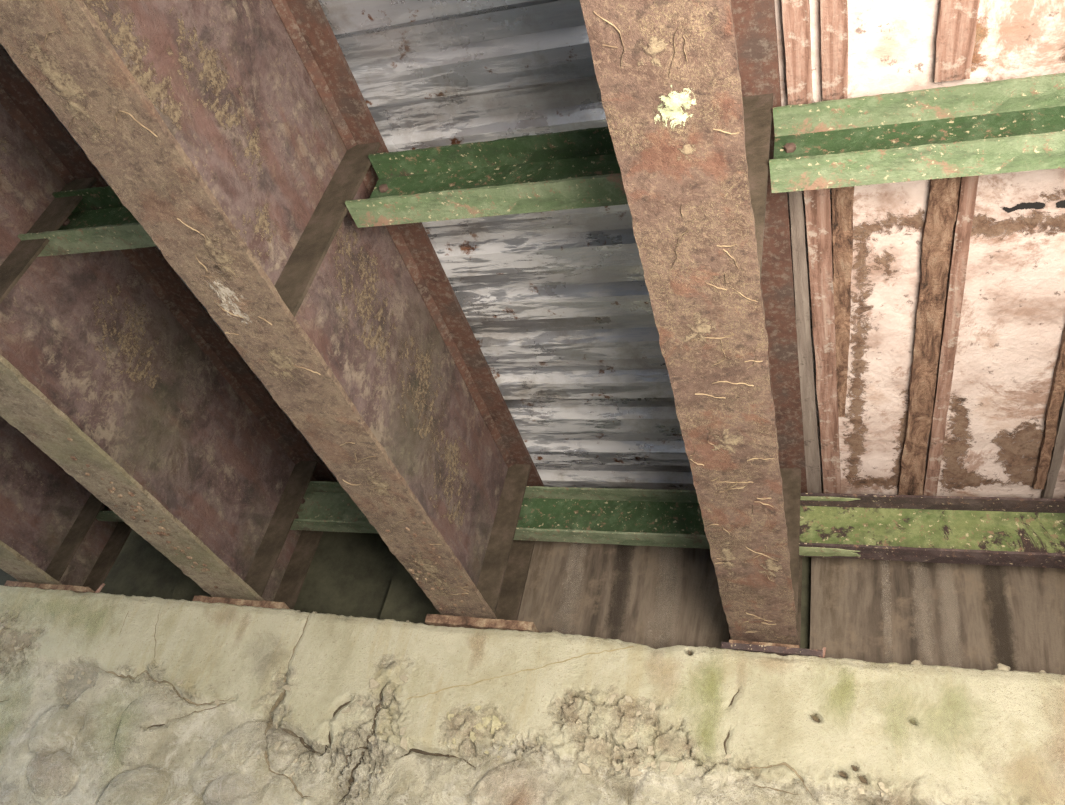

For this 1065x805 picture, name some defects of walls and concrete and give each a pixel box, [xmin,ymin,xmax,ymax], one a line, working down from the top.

crack [264,614,386,802]
crack [401,748,475,768]
flaking render [561,693,709,777]
crack [724,689,813,797]
flaking render [839,765,907,805]